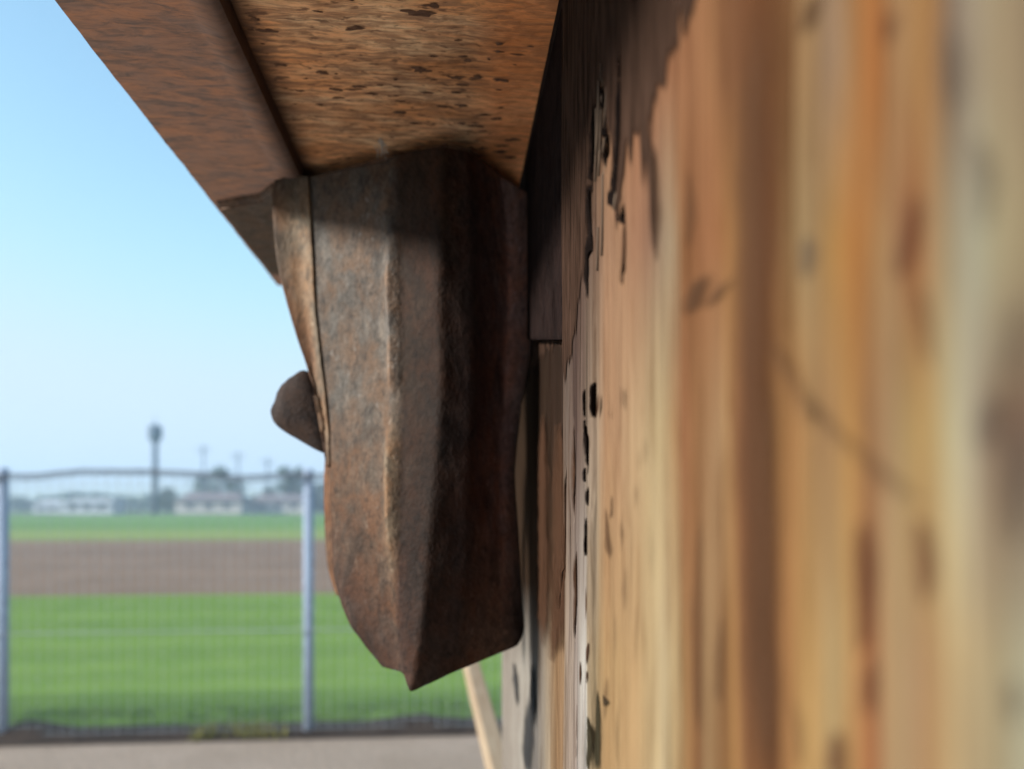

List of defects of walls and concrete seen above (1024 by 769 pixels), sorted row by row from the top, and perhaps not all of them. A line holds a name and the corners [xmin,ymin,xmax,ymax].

peeling [529,0,694,381]